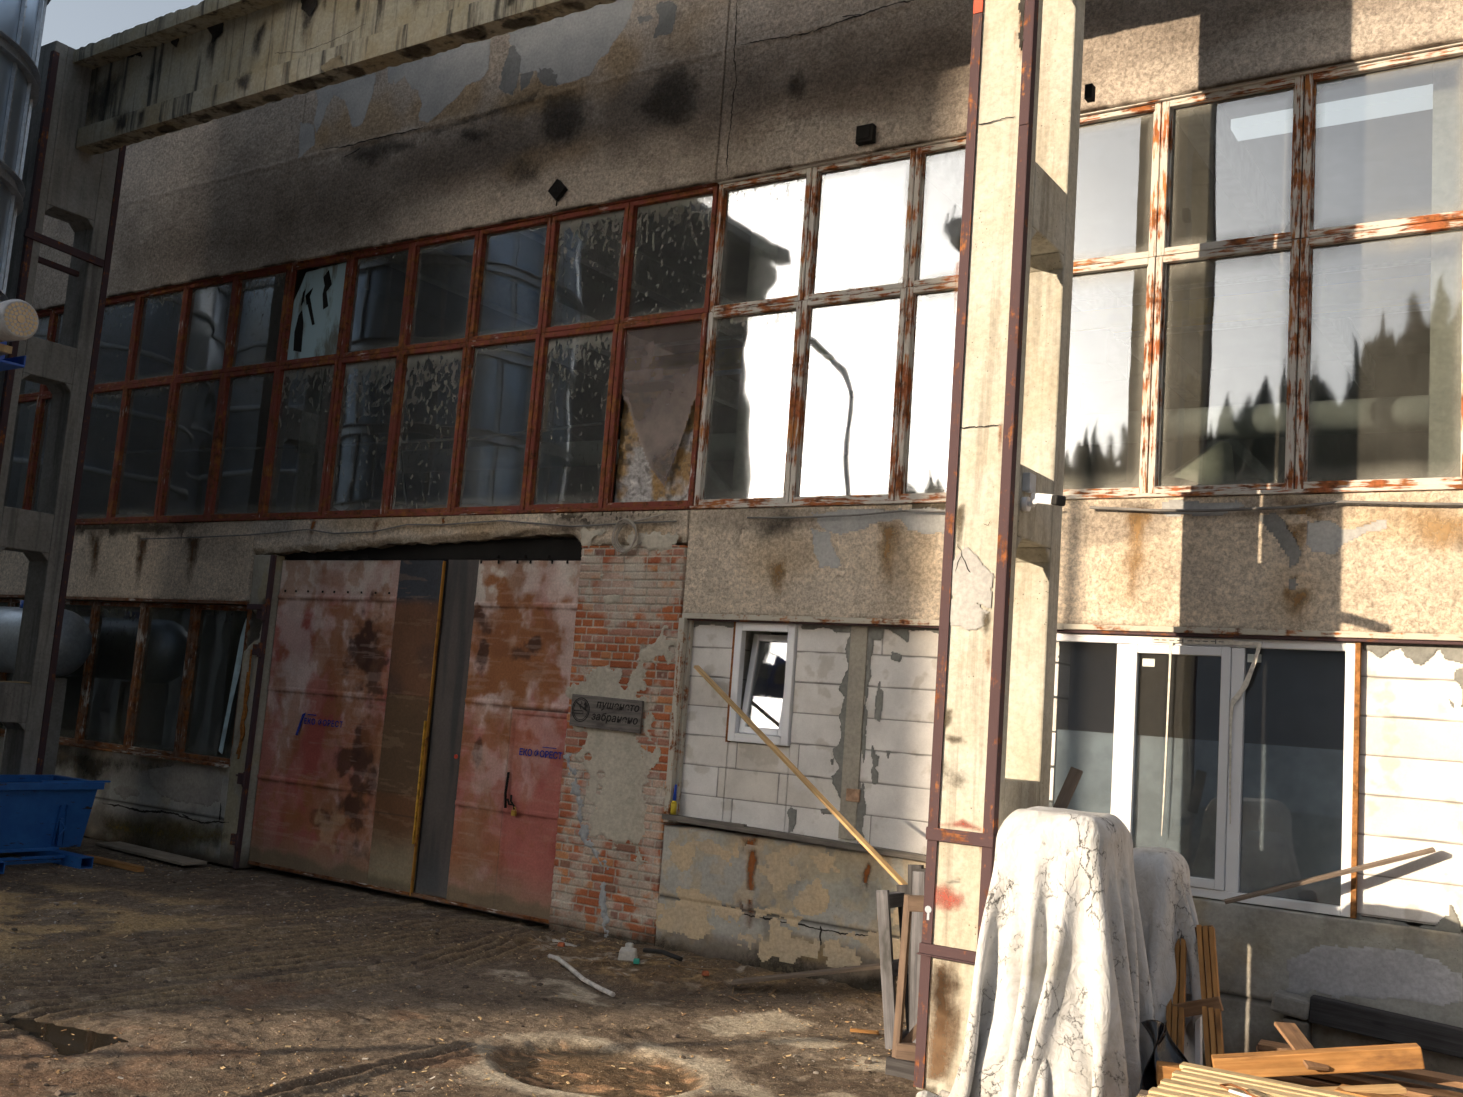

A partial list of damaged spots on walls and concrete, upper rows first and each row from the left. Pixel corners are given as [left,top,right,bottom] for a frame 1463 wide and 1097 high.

water stain [87,68,180,143]
water stain [195,66,366,120]
water stain [401,44,431,59]
peeling [298,0,677,158]
water stain [461,0,536,40]
water stain [562,2,585,10]
peeling [810,507,946,568]
peeling [1162,499,1244,517]
peeling [1260,513,1387,590]
peeling [565,625,677,866]
corrosion [740,837,757,921]
peeling [653,837,900,968]